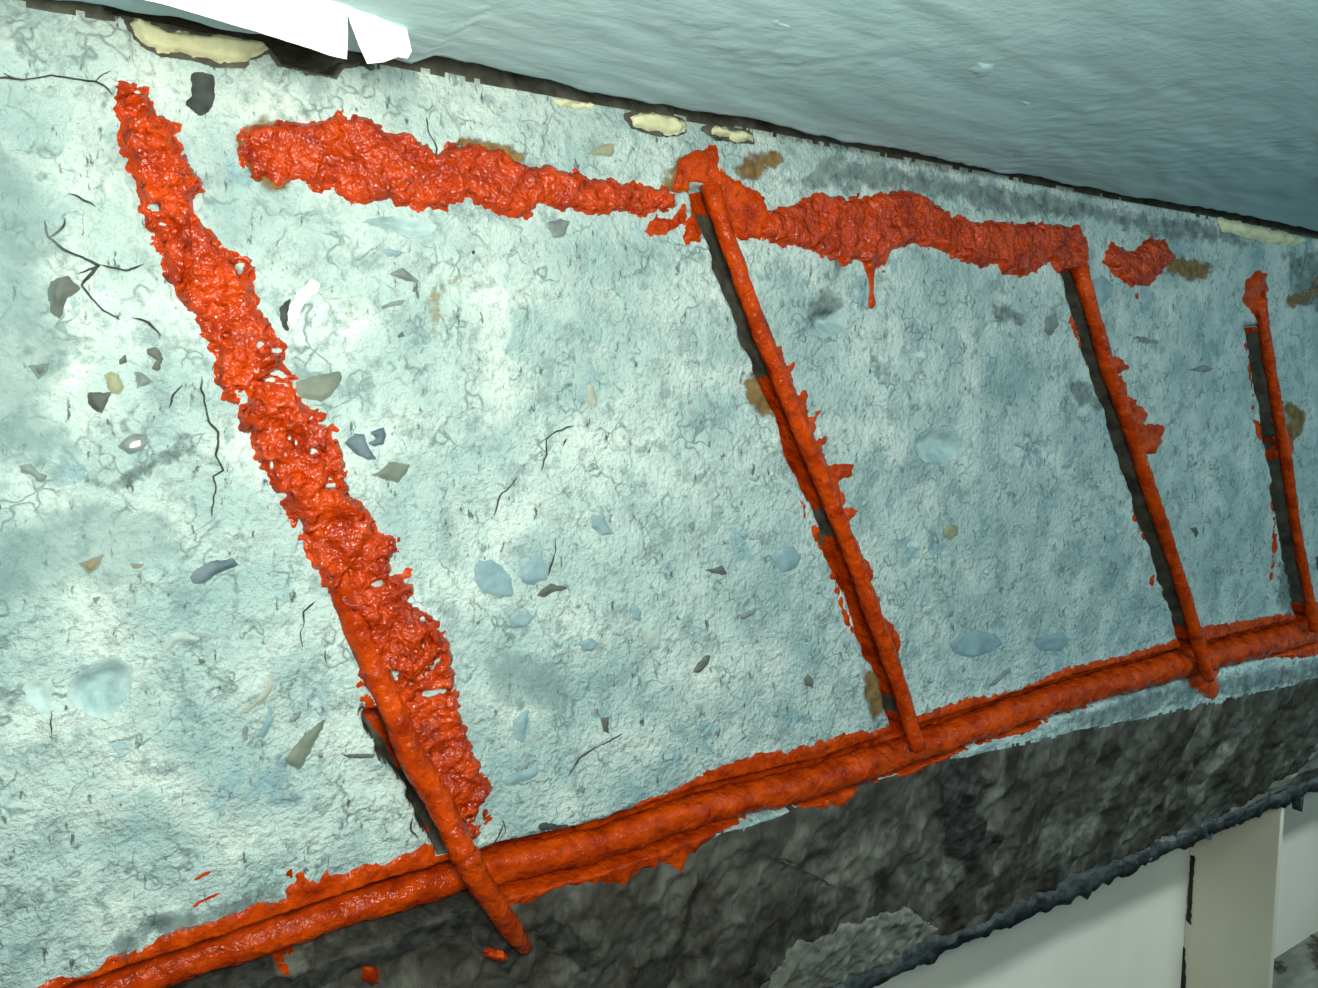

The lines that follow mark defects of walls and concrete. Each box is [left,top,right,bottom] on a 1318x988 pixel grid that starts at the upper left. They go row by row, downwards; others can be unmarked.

flaking render [95,0,412,80]
rust [455,138,524,162]
peeling [623,110,687,138]
peeling [701,123,755,145]
rust [736,150,784,180]
rust [1168,256,1211,281]
rust [744,373,774,417]
spalling [22,80,532,988]
spalling [479,145,1318,905]
rust [864,671,883,719]
spalling [831,776,1318,988]
rust [448,889,521,973]